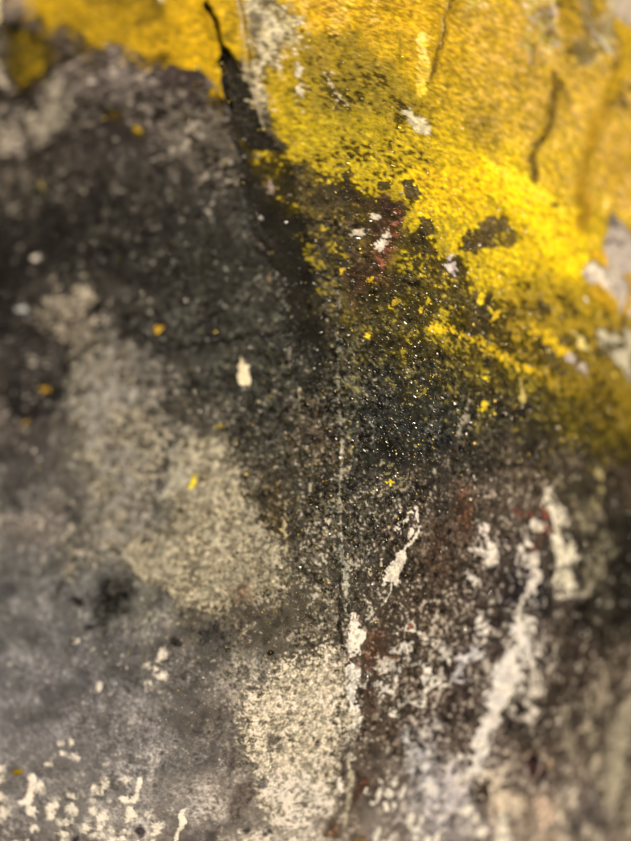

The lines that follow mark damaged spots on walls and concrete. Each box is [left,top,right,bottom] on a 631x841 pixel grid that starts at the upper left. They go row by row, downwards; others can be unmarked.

spalling [0,0,179,158]
crack [202,0,241,109]
leakage [374,230,392,251]
peeling [156,0,631,682]
leakage [56,334,289,658]
leakage [382,526,421,602]
peeling [136,638,204,699]
leakage [401,467,619,841]
peeling [58,739,80,760]
peeling [0,766,164,841]
leakage [553,671,631,841]